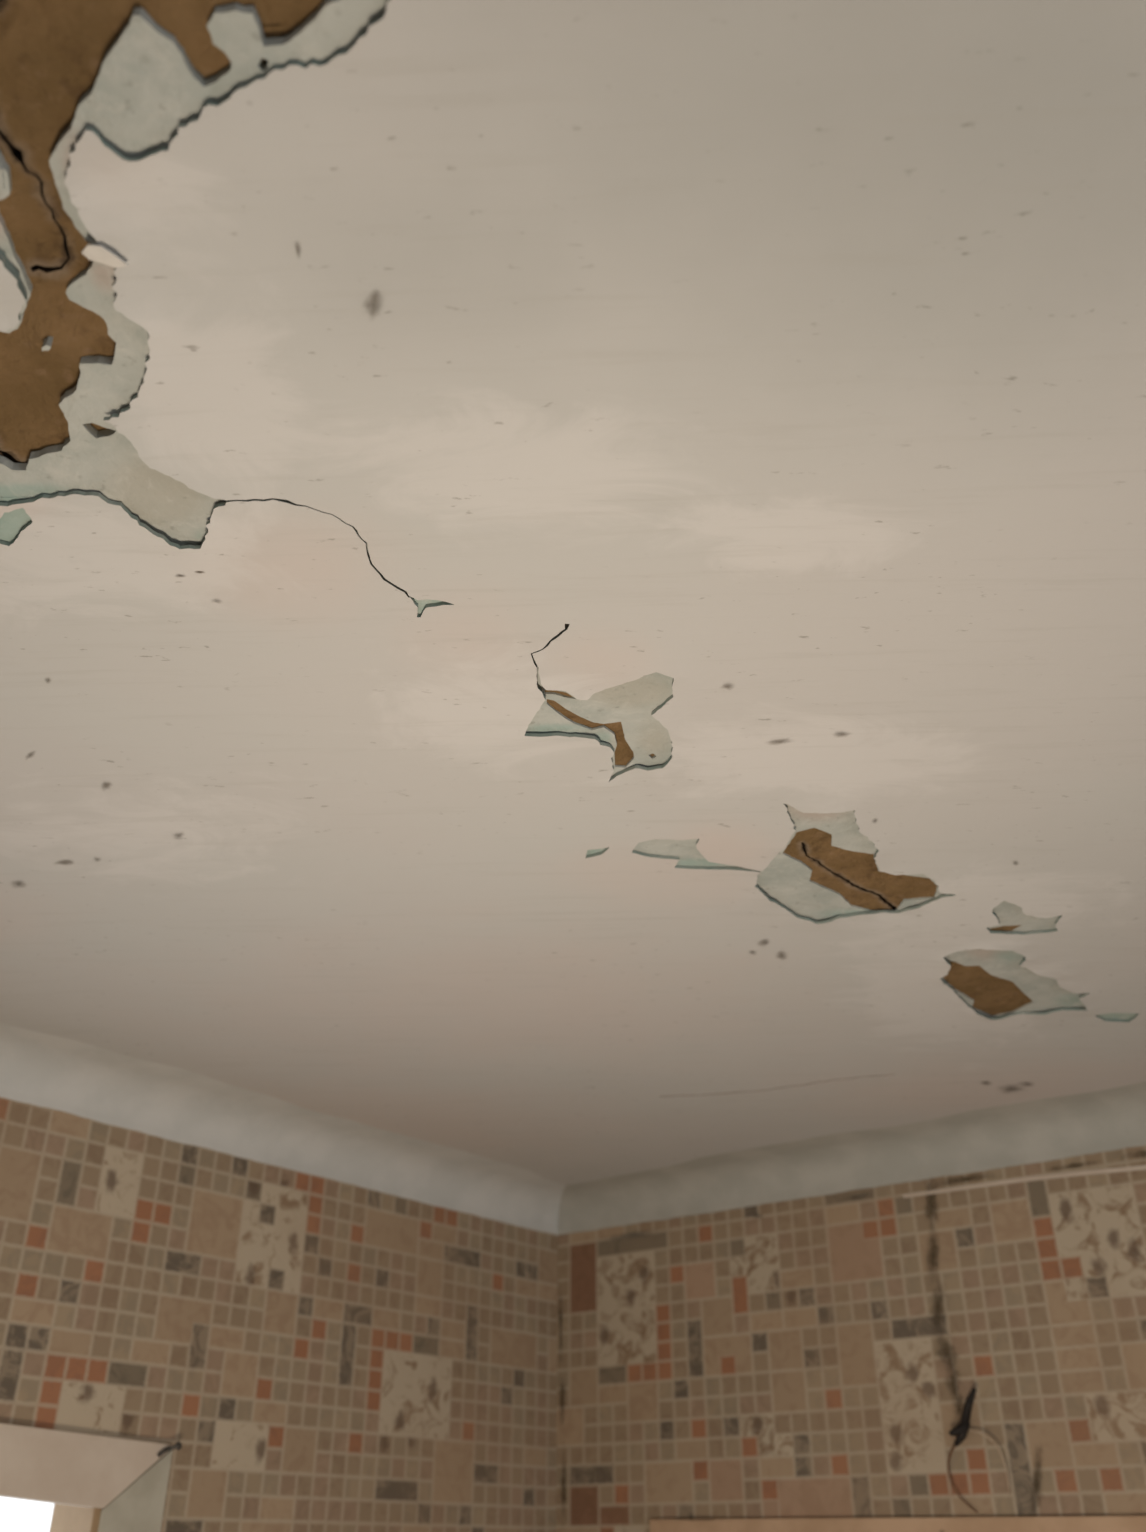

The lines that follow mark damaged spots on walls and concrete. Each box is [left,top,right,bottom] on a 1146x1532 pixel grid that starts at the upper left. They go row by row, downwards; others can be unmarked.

spalling [0,0,387,546]
crack [226,499,409,597]
crack [532,624,569,692]
spalling [526,657,673,777]
spalling [633,804,944,921]
spalling [988,901,1059,932]
spalling [942,949,1136,1020]